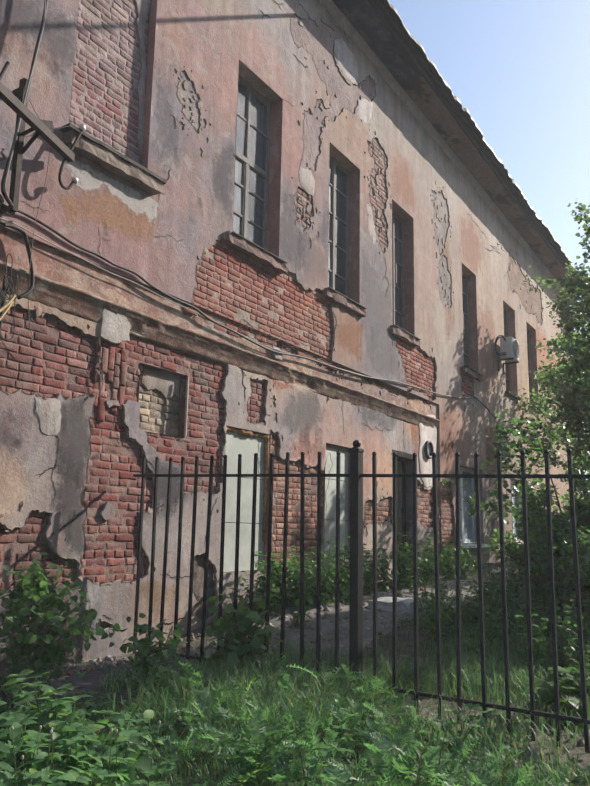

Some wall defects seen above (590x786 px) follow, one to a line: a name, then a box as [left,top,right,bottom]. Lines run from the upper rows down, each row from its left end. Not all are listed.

peeling [66,160,158,221]
spalling [290,13,377,247]
spalling [364,133,391,253]
spalling [181,235,437,409]
damp [57,400,90,552]
spalling [0,301,229,607]
spalling [238,375,333,567]
spalling [192,552,218,622]